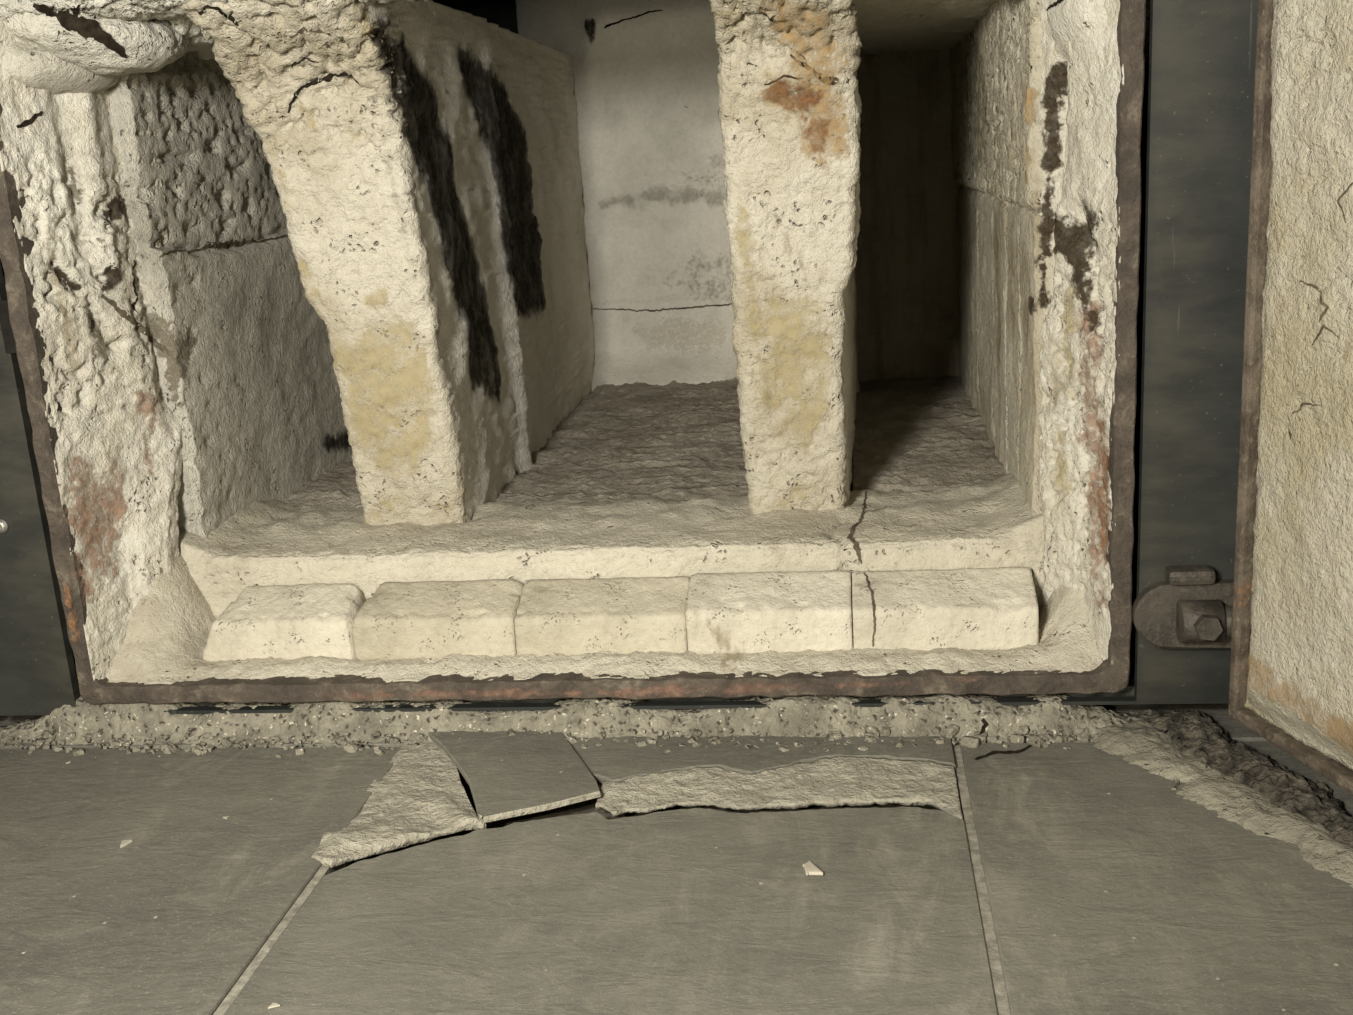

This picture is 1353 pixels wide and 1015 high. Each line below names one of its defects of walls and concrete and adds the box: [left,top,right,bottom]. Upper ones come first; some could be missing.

crack [33,3,127,58]
crack [267,0,358,113]
rust [763,0,849,164]
crack [1046,0,1063,11]
leakage [370,16,501,402]
leakage [459,45,546,317]
crack [846,491,887,646]
rust [601,685,682,697]
spalling [311,738,486,868]
spalling [596,756,963,819]